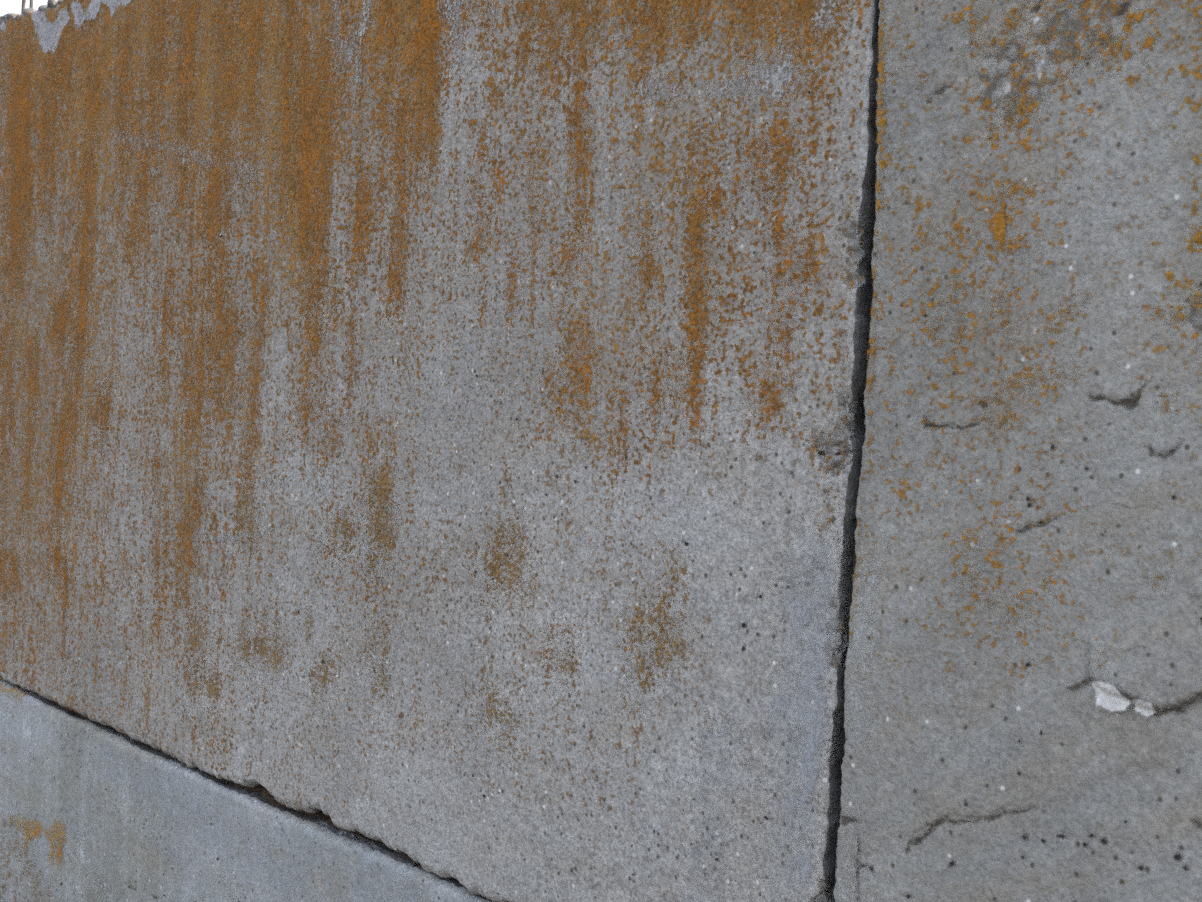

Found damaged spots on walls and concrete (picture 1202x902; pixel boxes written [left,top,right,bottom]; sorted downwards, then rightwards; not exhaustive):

peeling [31,0,131,54]
corrosion [0,0,871,818]
crack [1067,678,1095,691]
peeling [1092,681,1156,717]
crack [1132,692,1202,716]
crack [905,806,1033,854]
corrosion [0,815,66,902]